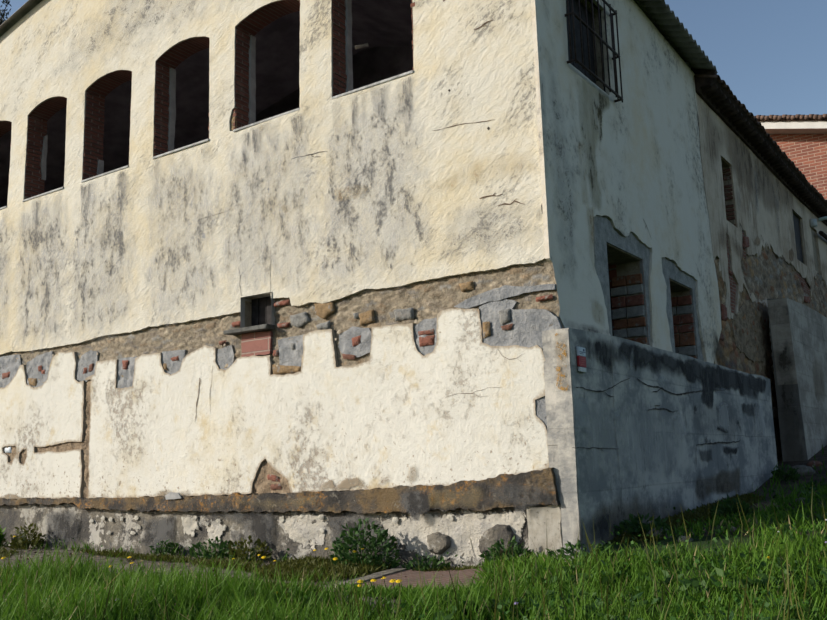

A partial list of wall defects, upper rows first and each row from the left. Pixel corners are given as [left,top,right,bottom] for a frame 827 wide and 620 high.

leakage [316,77,423,271]
leakage [226,130,308,275]
leakage [20,172,130,338]
leakage [153,167,213,305]
spalling [414,318,441,355]
crack [576,377,762,412]
leakage [589,336,766,433]
crack [696,426,741,465]
spalling [252,460,290,494]
peeling [181,516,226,544]
peeling [277,512,329,550]
peeling [376,508,527,563]